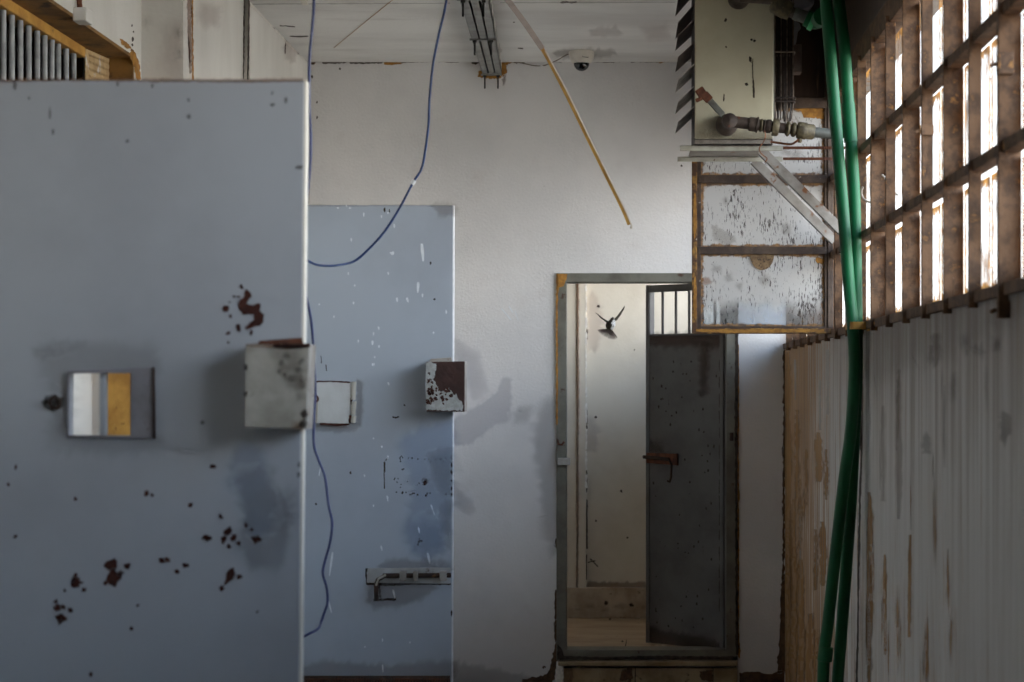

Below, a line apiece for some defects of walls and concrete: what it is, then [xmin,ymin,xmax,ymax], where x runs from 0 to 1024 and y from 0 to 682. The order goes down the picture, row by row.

rust [222,284,264,344]
rust [202,514,262,549]
rust [103,558,131,587]
rust [219,567,242,591]
rust [53,573,86,625]